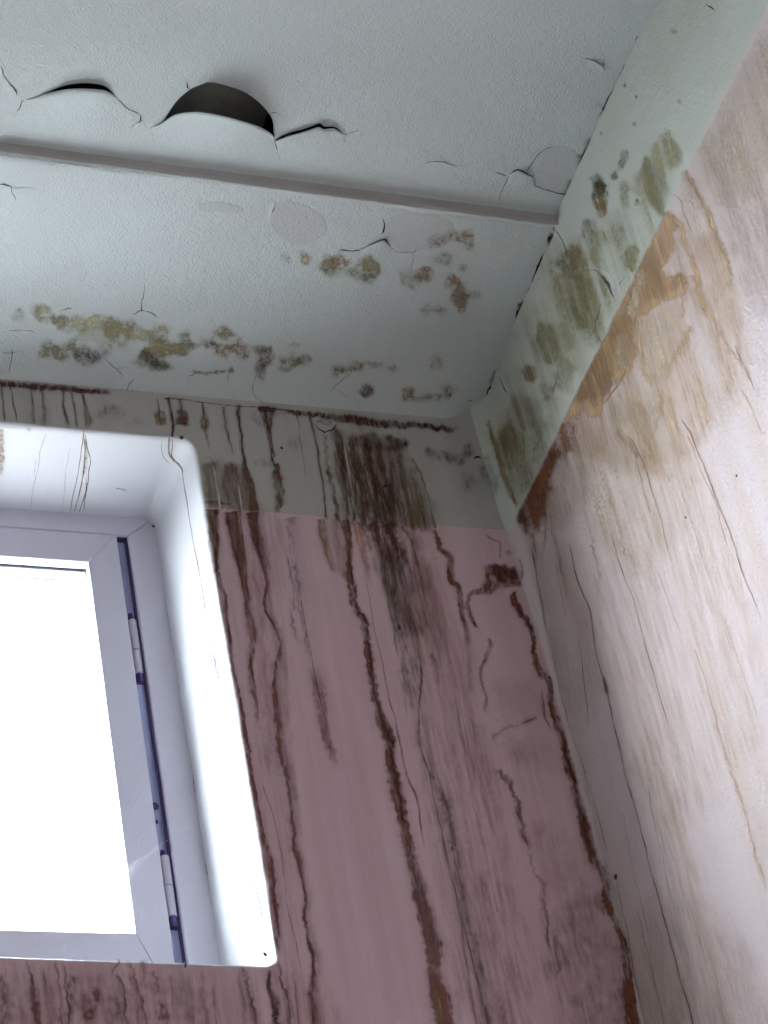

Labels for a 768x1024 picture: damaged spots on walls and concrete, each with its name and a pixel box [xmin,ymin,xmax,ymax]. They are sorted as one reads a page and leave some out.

peeling [17,83,140,140]
peeling [150,82,358,168]
water stain [35,307,190,369]
water stain [206,327,311,377]
water stain [320,256,380,278]
water stain [448,268,470,312]
water stain [537,133,716,498]
water stain [487,400,541,502]
corrosion [468,536,639,1024]